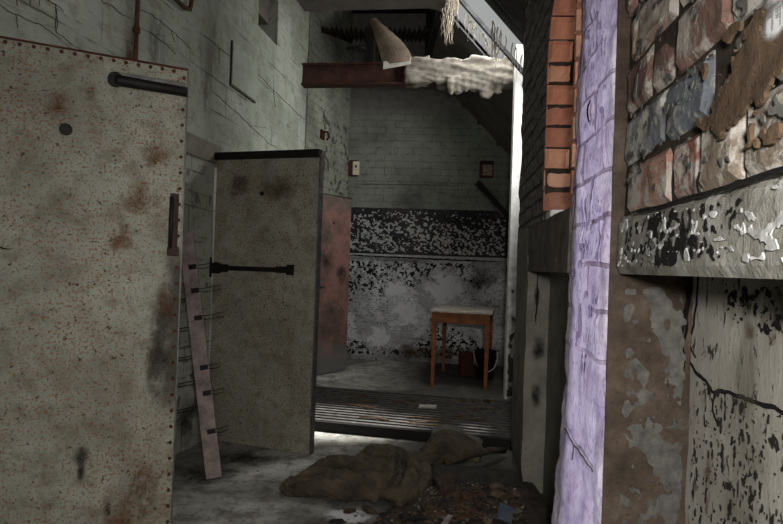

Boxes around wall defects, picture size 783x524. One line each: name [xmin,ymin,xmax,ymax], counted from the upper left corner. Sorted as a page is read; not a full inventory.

crack [0,0,81,50]
crack [630,166,783,213]
peeling [348,209,506,308]
spalling [617,198,783,268]
peeling [346,327,483,359]
crack [679,277,783,427]